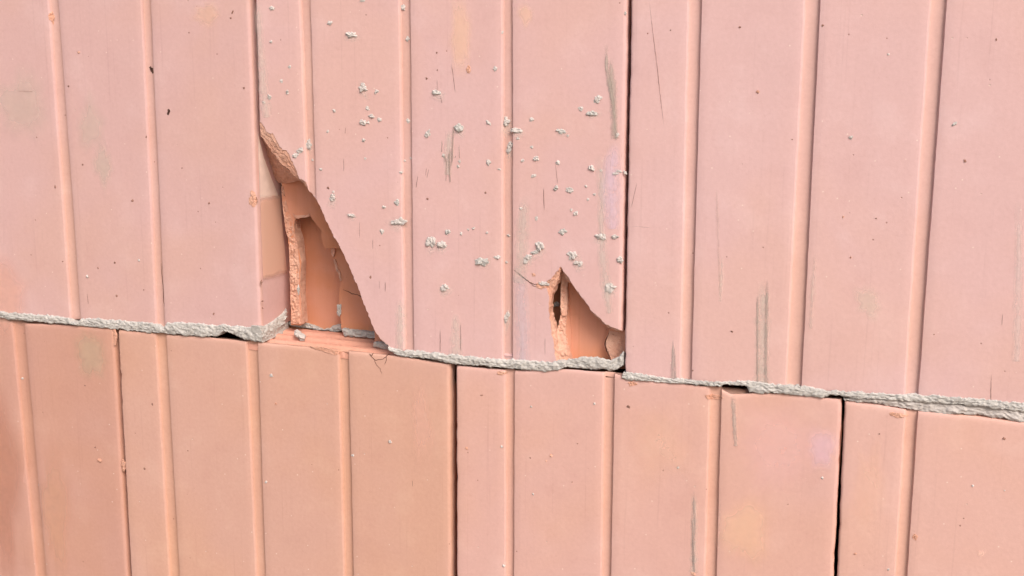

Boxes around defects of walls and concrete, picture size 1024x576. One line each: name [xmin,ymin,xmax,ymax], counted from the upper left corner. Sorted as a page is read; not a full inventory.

spalling [262,138,382,342]
spalling [531,273,626,369]